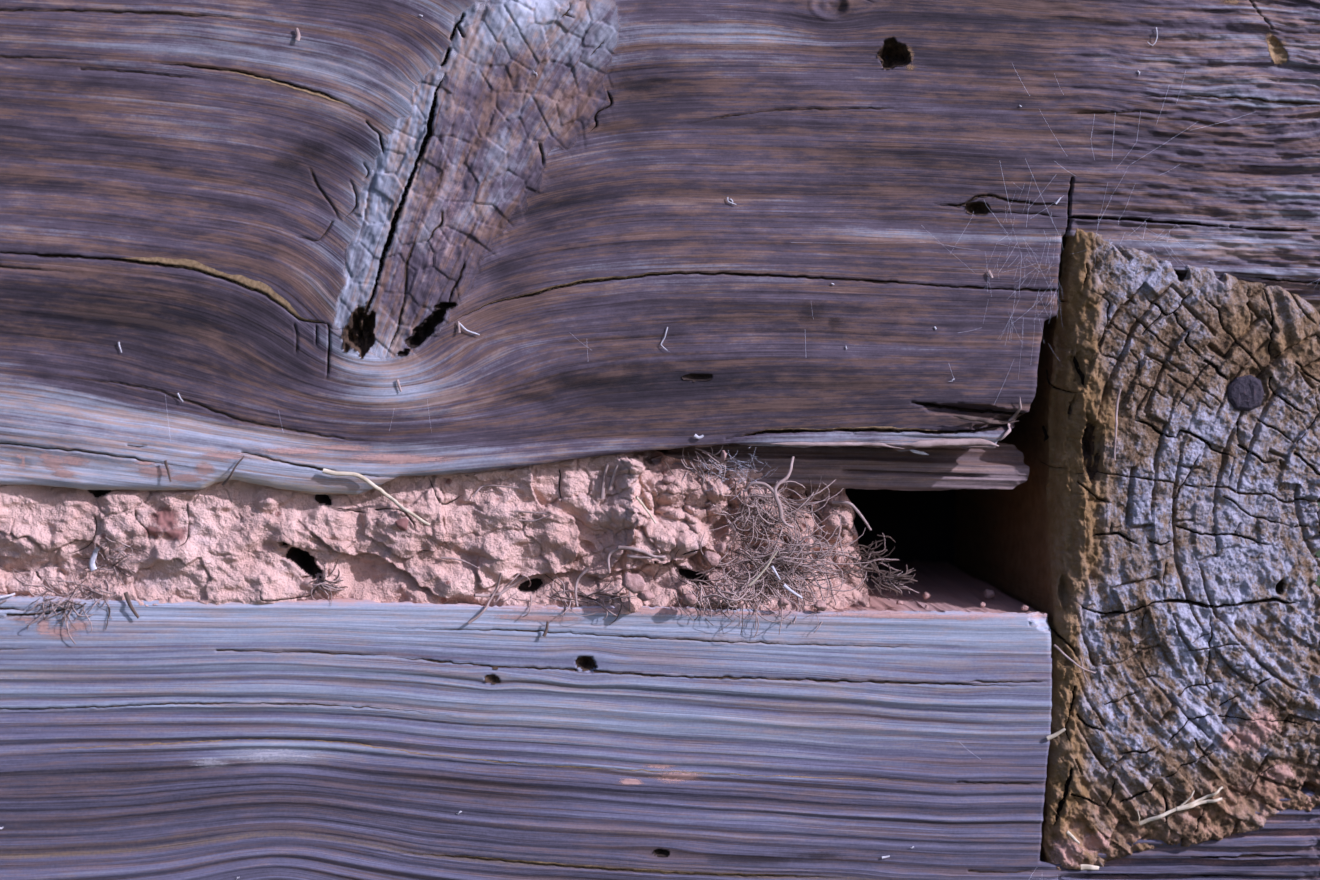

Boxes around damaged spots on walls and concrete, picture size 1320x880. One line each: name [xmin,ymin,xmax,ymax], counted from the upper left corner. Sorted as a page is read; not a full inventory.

crack [0,9,269,23]
crack [590,90,612,132]
crack [689,107,929,124]
crack [0,15,464,376]
crack [0,262,1320,878]